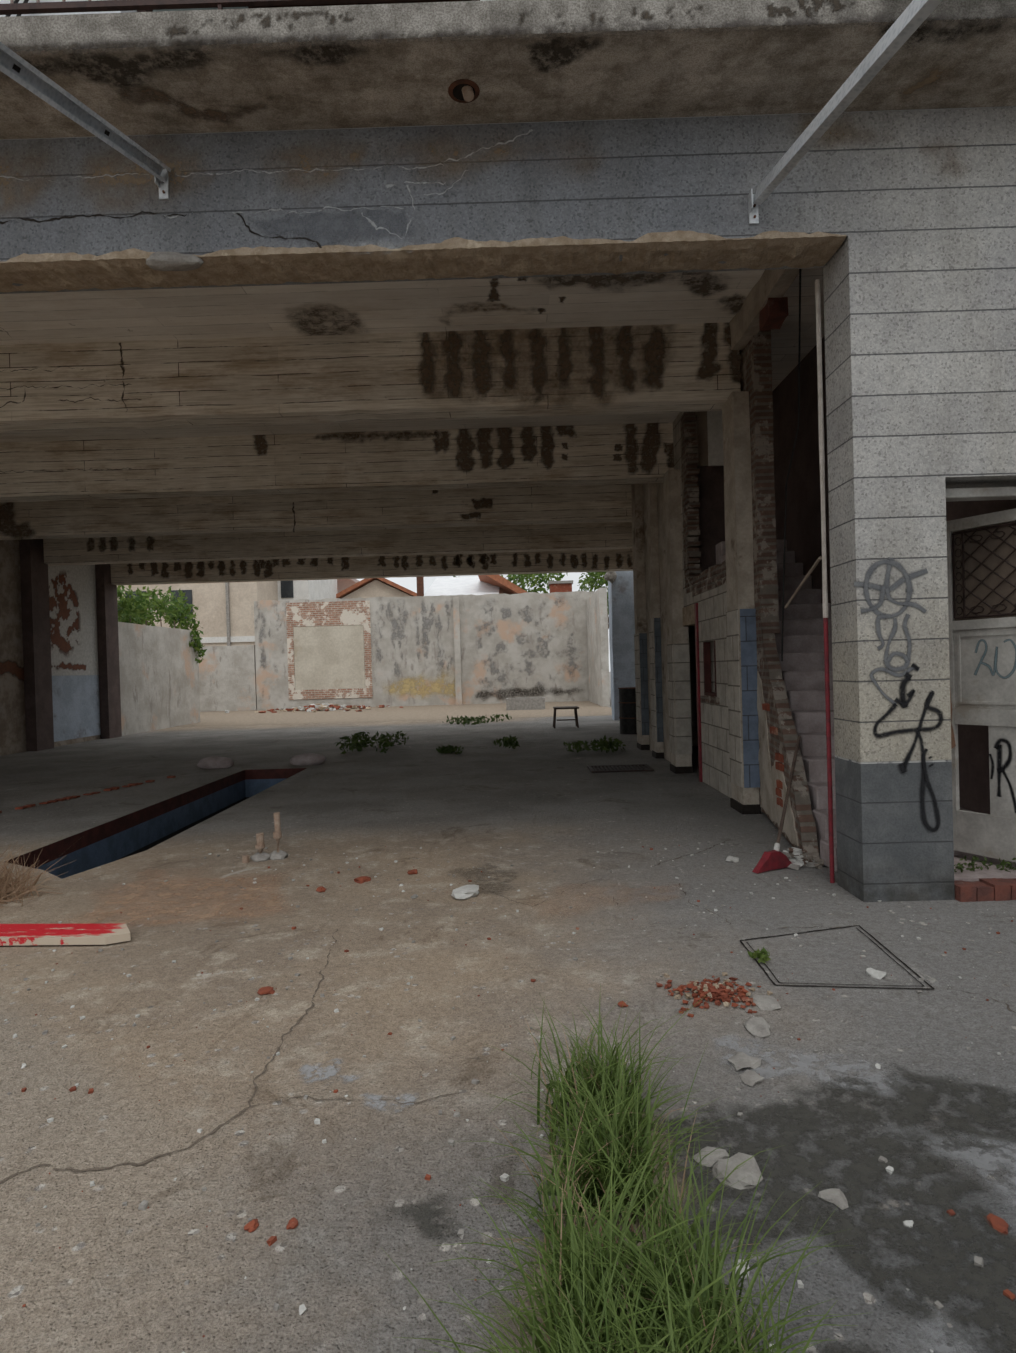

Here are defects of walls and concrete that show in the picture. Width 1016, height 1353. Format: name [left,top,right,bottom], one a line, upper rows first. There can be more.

damp [8,0,895,122]
damp [910,17,1007,44]
crack [0,129,533,248]
crack [0,343,141,412]
damp [295,306,360,336]
damp [450,278,514,313]
damp [420,308,671,403]
damp [544,272,744,383]
damp [316,425,577,472]
damp [613,423,674,474]
peeling [49,573,86,671]
crack [0,929,456,1183]